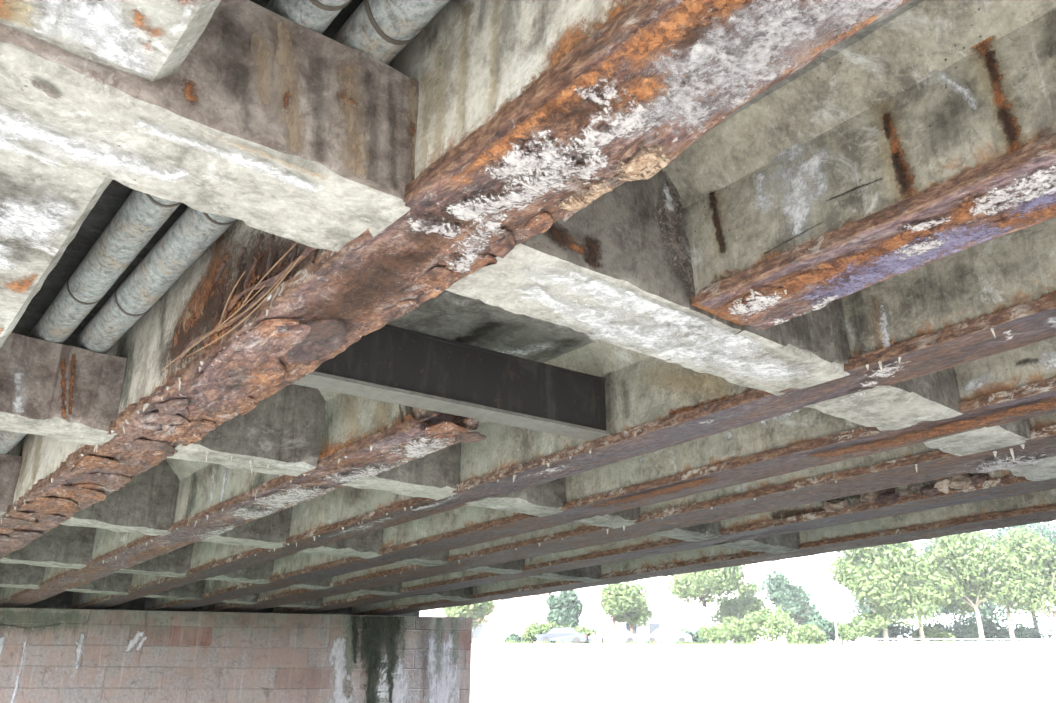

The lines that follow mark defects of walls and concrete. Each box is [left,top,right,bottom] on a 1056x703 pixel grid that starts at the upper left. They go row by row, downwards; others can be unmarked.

spalling [161,227,319,384]
rust [450,0,745,184]
rust [525,144,681,267]
leakage [406,0,903,273]
rust [715,194,994,319]
rust [883,113,919,200]
leakage [938,72,977,108]
rust [971,36,1024,156]
rust [130,319,346,466]
leakage [0,610,88,703]
leakage [125,631,147,652]
leakage [329,616,460,703]